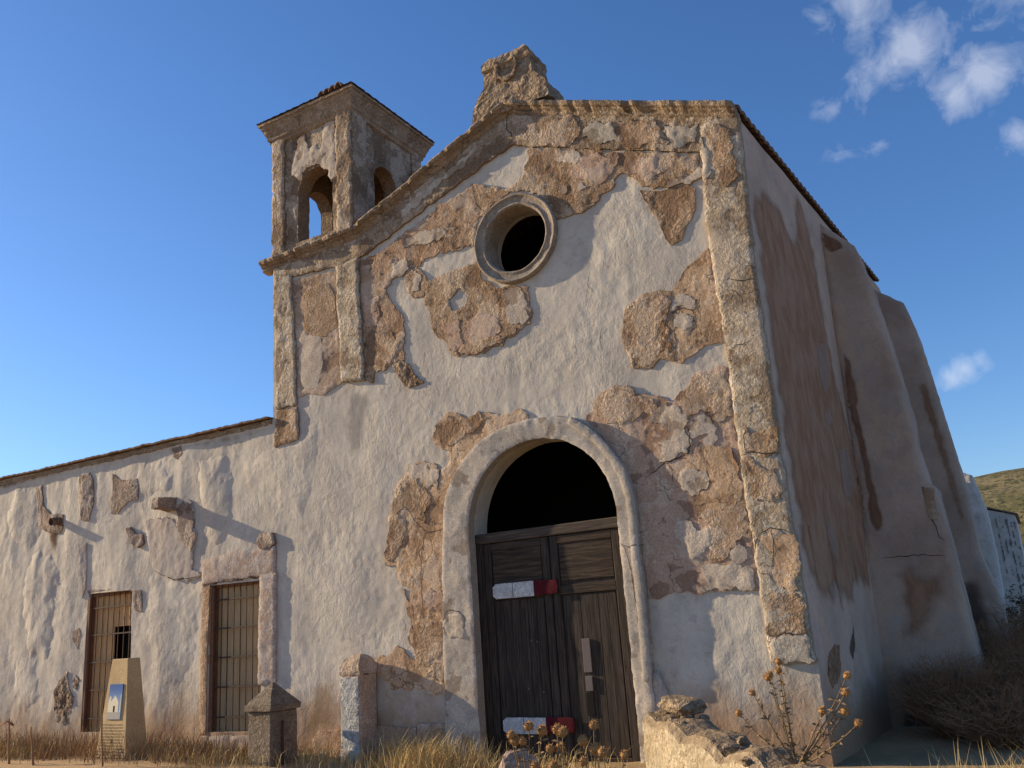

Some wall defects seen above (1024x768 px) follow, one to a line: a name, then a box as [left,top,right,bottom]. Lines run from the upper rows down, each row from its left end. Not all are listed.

flaking render [126,499,201,582]
peeling [298,283,338,389]
flaking render [376,408,529,698]
flaking render [360,114,738,388]
flaking render [586,366,815,664]
water stain [754,194,869,603]
crack [884,519,947,558]
spalling [53,671,79,725]